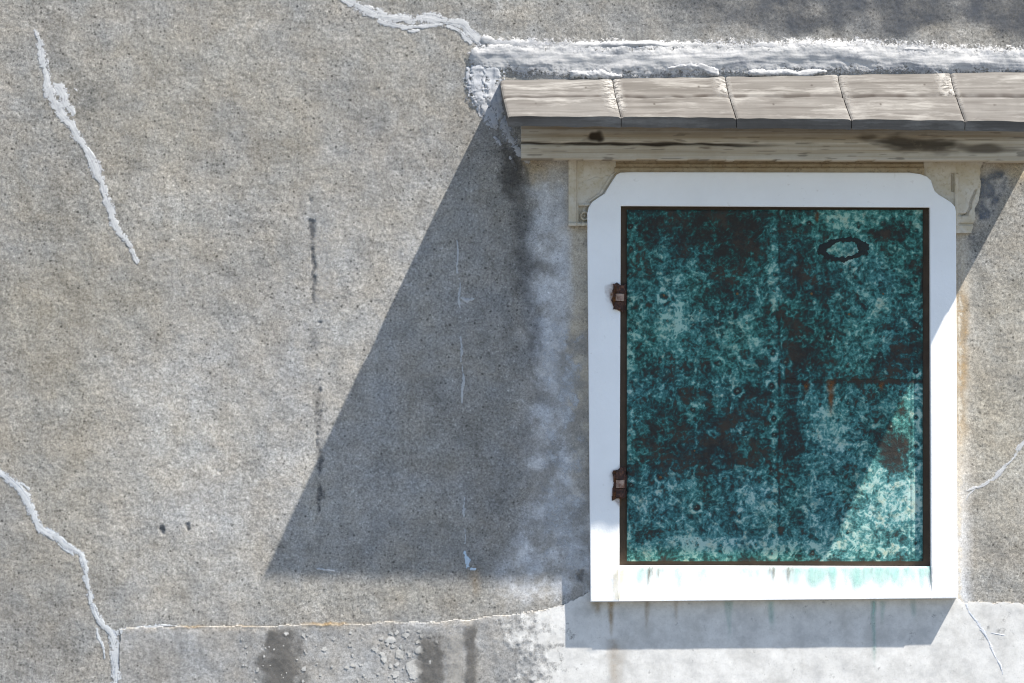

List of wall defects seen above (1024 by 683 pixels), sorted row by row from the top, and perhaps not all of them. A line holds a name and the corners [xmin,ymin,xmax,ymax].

crack [341,0,487,46]
crack [33,29,140,265]
crack [308,220,316,298]
crack [456,240,474,308]
crack [458,336,466,404]
crack [316,451,324,511]
crack [966,441,1024,500]
crack [0,469,182,683]
water stain [810,566,931,587]
water stain [259,630,301,683]
water stain [419,628,477,683]